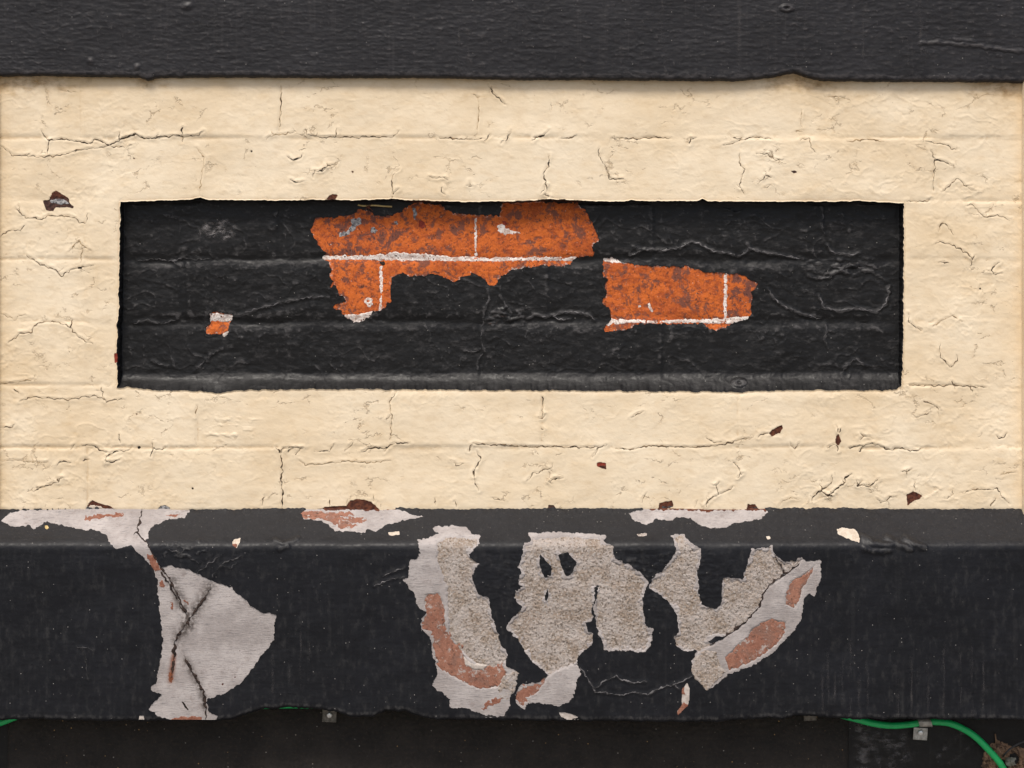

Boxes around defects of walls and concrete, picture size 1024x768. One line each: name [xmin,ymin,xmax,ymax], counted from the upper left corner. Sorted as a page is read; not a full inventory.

crack [1,127,204,188]
crack [271,91,398,183]
crack [1,207,92,277]
peeling [310,202,758,332]
crack [262,395,407,506]
crack [455,397,769,507]
crack [783,429,921,502]
peeling [301,499,423,536]
peeling [630,501,768,536]
peeling [837,527,860,543]
peeling [1,500,276,720]
peeling [403,525,821,720]